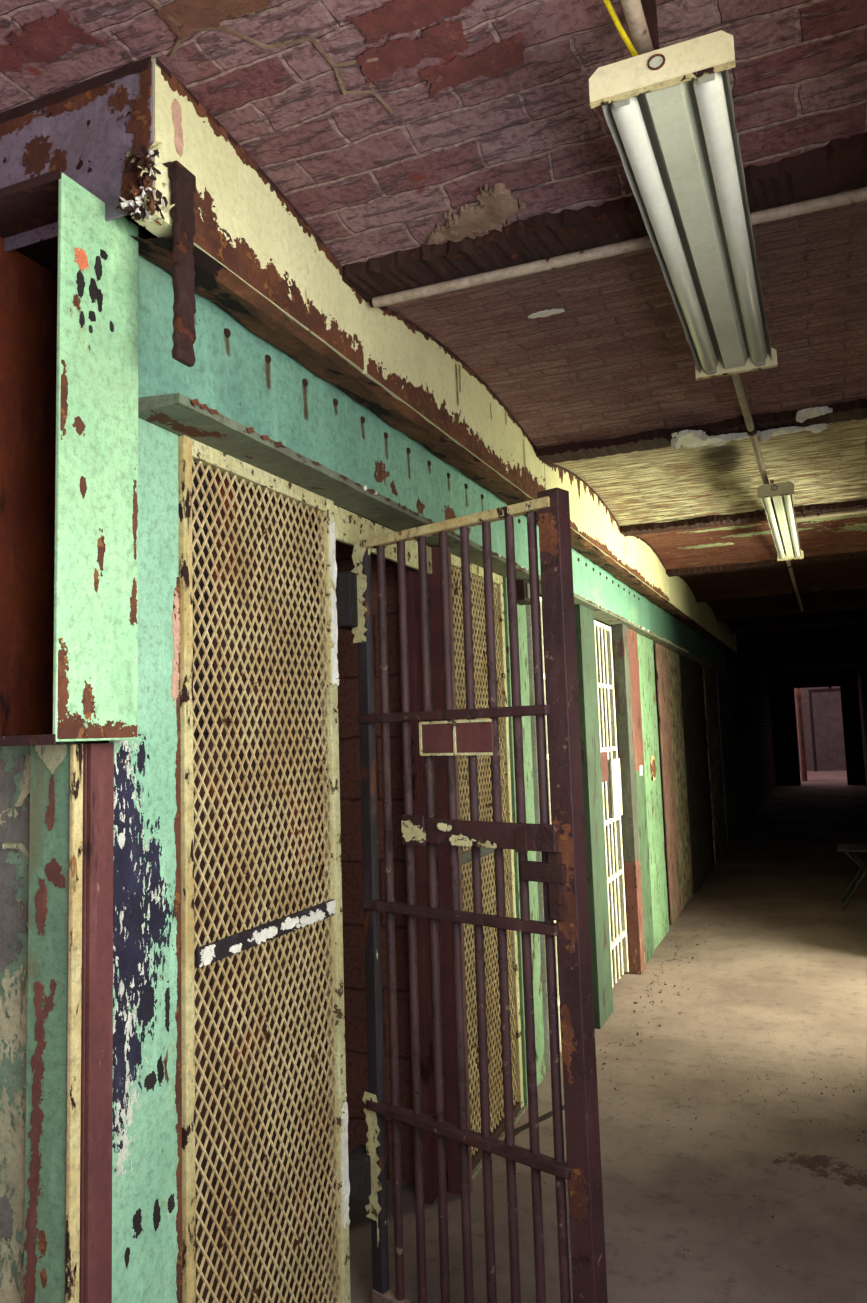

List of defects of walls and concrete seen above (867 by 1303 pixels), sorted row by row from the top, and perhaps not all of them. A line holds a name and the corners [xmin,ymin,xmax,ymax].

corrosion [0,56,152,209]
peeling [74,247,114,334]
peeling [161,69,545,499]
spalling [528,308,565,319]
peeling [442,504,456,520]
spalling [0,744,66,1303]
peeling [112,733,176,1178]
peeling [199,900,336,968]
corrosion [23,978,57,1303]
peeling [124,1193,175,1268]